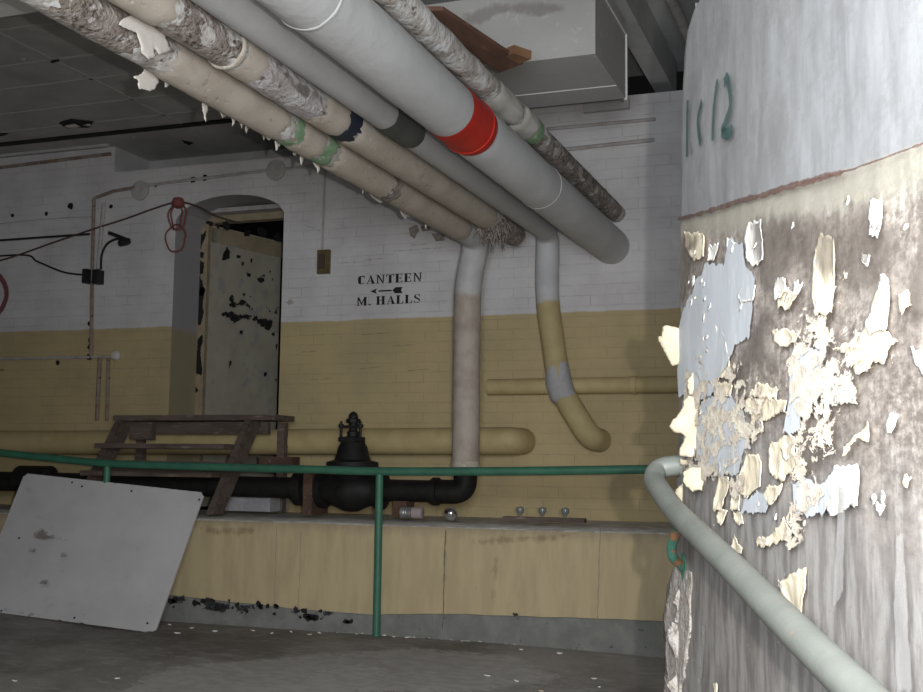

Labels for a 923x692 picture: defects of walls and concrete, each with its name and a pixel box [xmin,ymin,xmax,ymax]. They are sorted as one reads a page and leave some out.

peeling [868,198,882,239]
peeling [910,346,923,375]
peeling [658,219,911,554]
peeling [778,567,806,612]